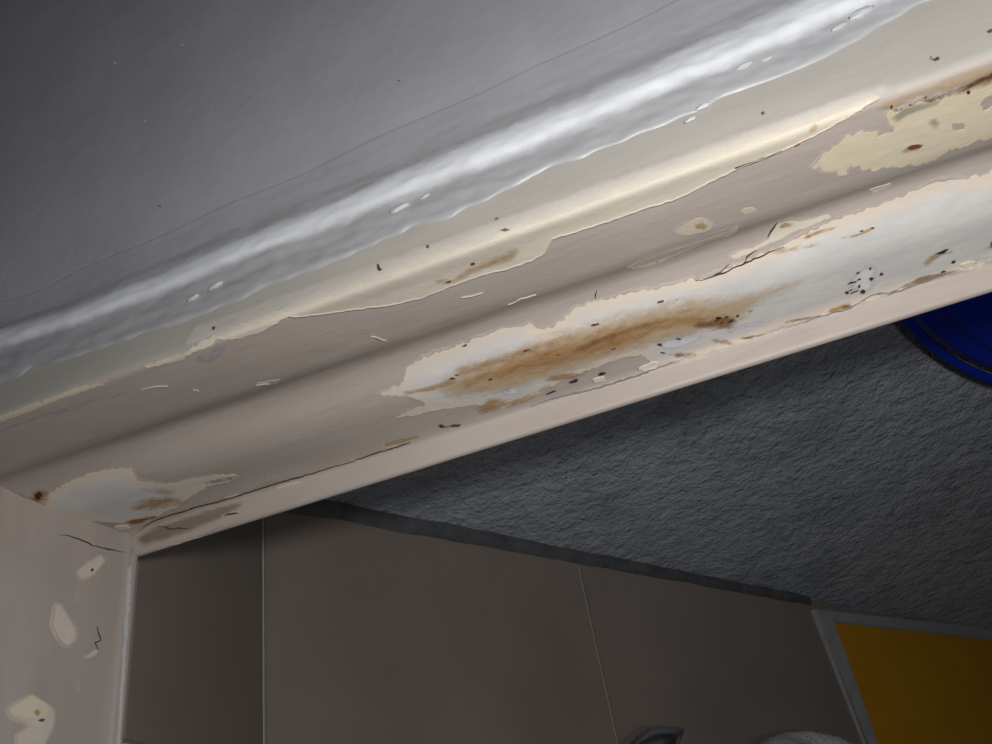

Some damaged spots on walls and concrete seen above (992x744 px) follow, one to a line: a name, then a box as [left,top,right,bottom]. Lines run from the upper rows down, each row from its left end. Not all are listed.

peeling [807,79,992,178]
rust [925,68,992,101]
peeling [141,83,887,368]
peeling [376,168,992,419]
rust [830,267,883,312]
rust [405,296,755,412]
peeling [0,381,106,430]
peeling [39,466,239,531]
crack [138,442,411,554]
peeling [49,535,122,649]
peeling [5,693,56,744]